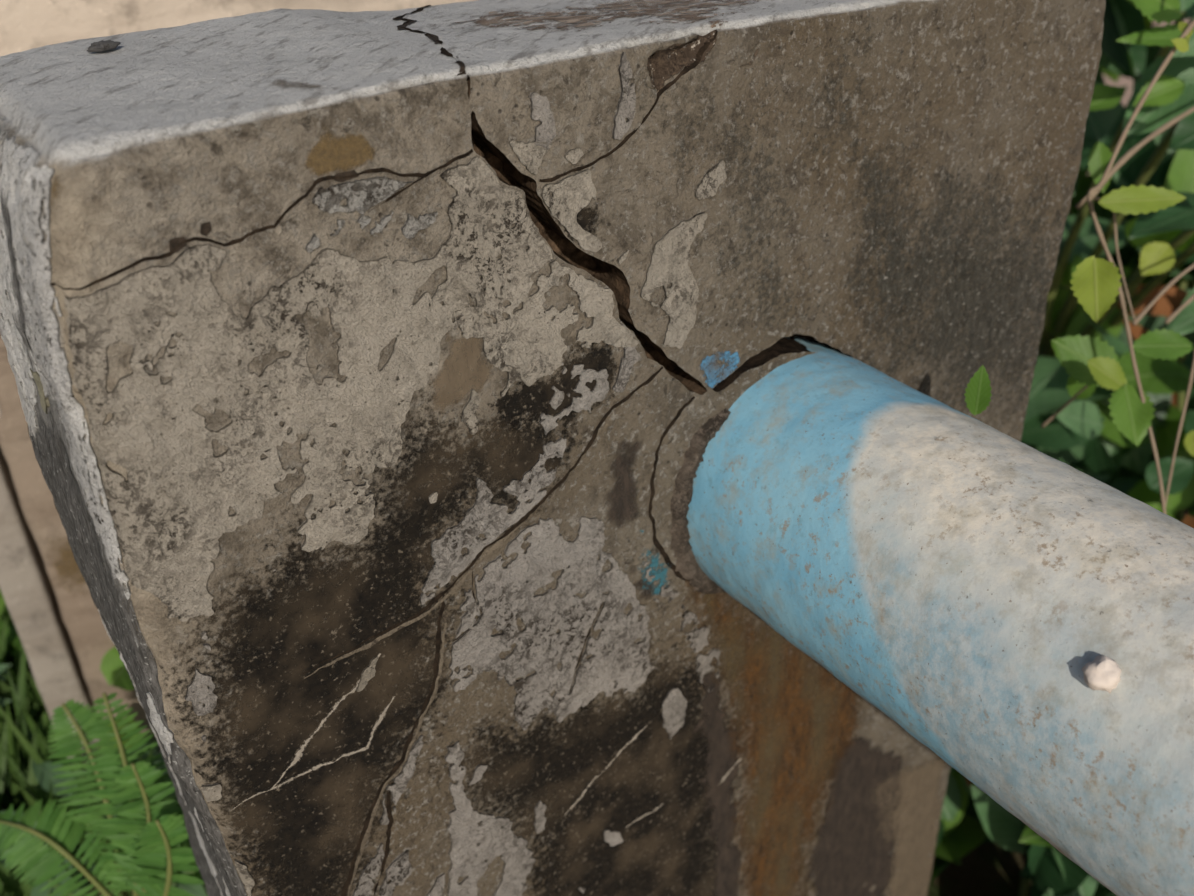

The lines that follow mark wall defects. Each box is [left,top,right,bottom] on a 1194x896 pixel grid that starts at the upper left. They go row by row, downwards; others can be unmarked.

peeling [0,119,727,731]
leakage [28,333,746,896]
crack [15,5,853,896]
peeling [509,92,602,252]
peeling [662,688,687,739]